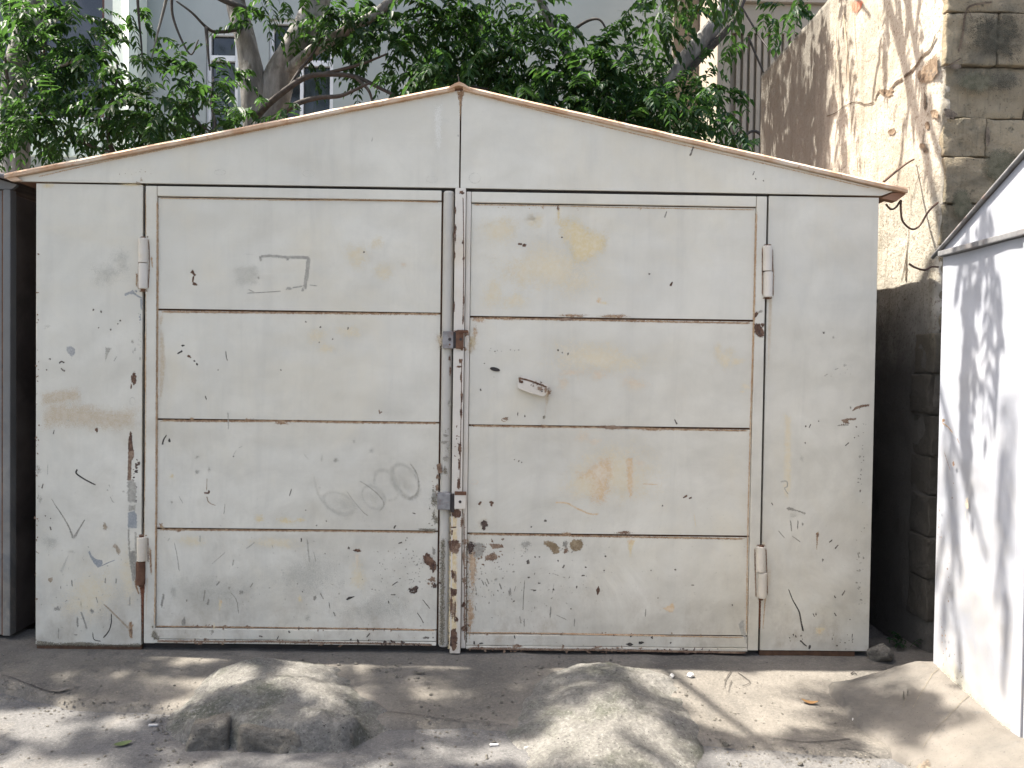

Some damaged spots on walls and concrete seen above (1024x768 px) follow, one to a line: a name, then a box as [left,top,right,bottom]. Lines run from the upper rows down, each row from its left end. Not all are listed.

rust [119,169,443,647]
peeling [465,538,584,631]
rust [399,191,775,655]